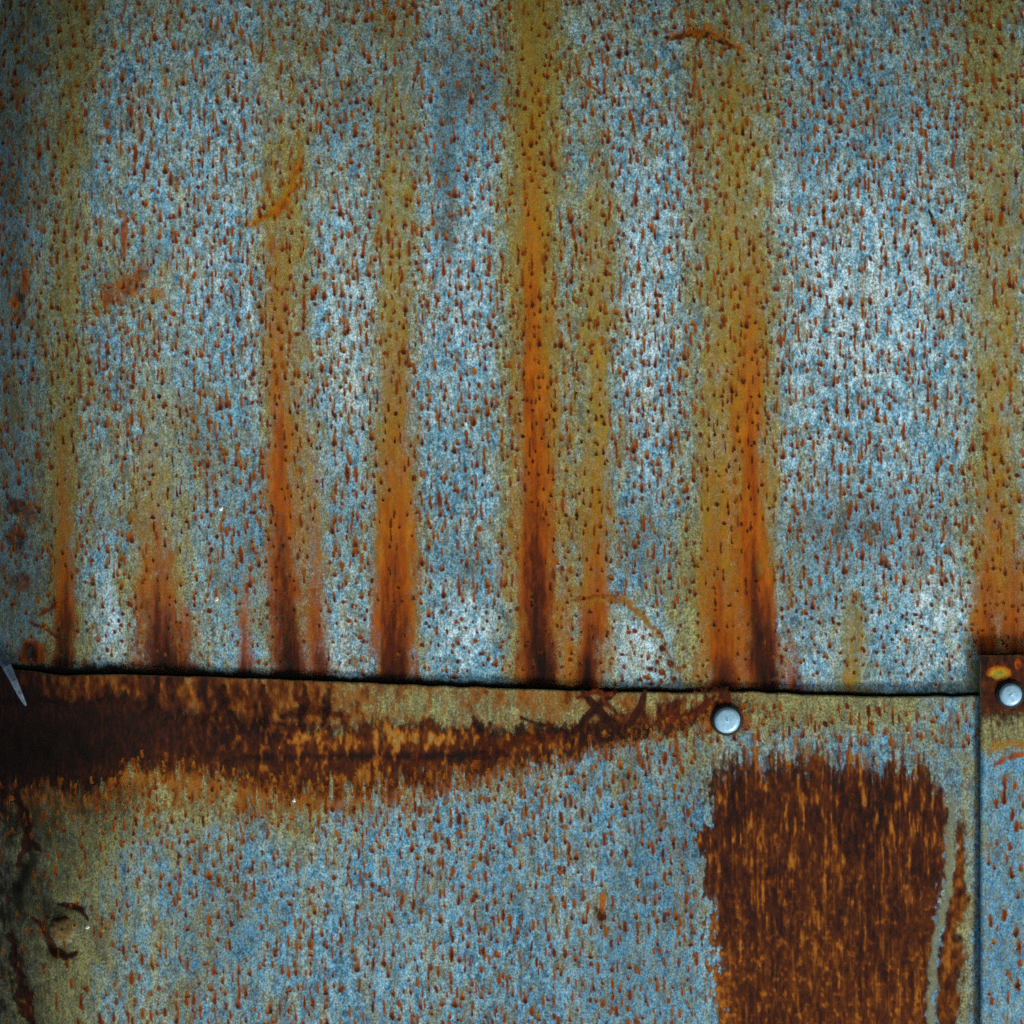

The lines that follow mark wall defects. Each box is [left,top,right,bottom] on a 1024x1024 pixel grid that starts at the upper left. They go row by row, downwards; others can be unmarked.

corrosion [582,0,660,44]
corrosion [191,40,226,86]
corrosion [250,30,275,63]
corrosion [456,130,506,182]
corrosion [432,638,470,679]
corrosion [872,601,961,681]